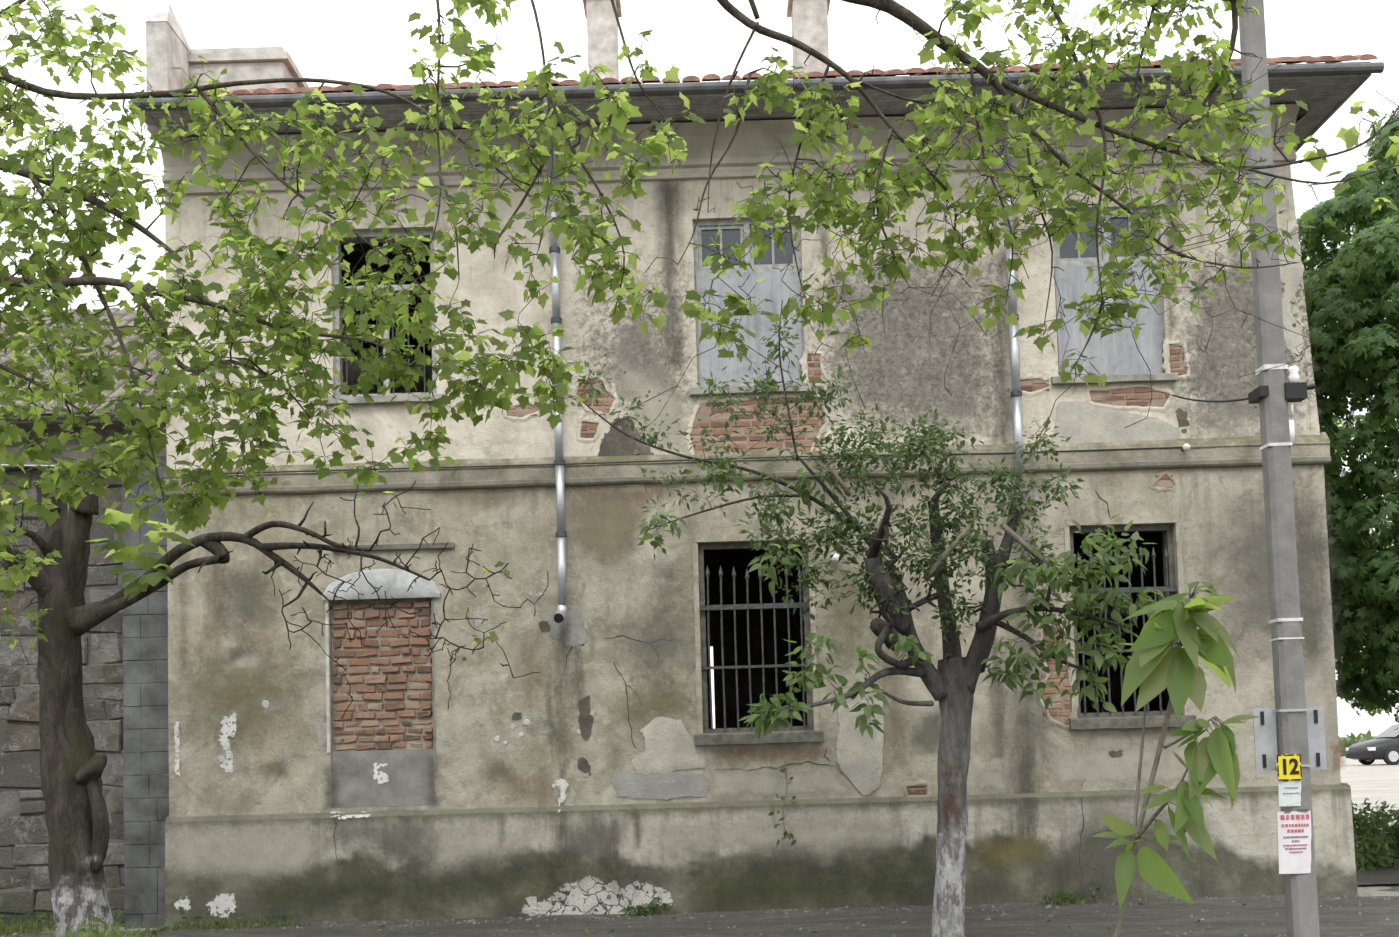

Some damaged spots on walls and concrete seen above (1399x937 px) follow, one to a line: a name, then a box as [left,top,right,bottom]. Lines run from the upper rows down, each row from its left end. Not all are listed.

leakage [660,182,680,364]
flaking render [1176,254,1260,436]
peeling [216,713,238,774]
peeling [552,757,591,812]
flaking render [577,695,595,740]
crack [714,746,862,797]